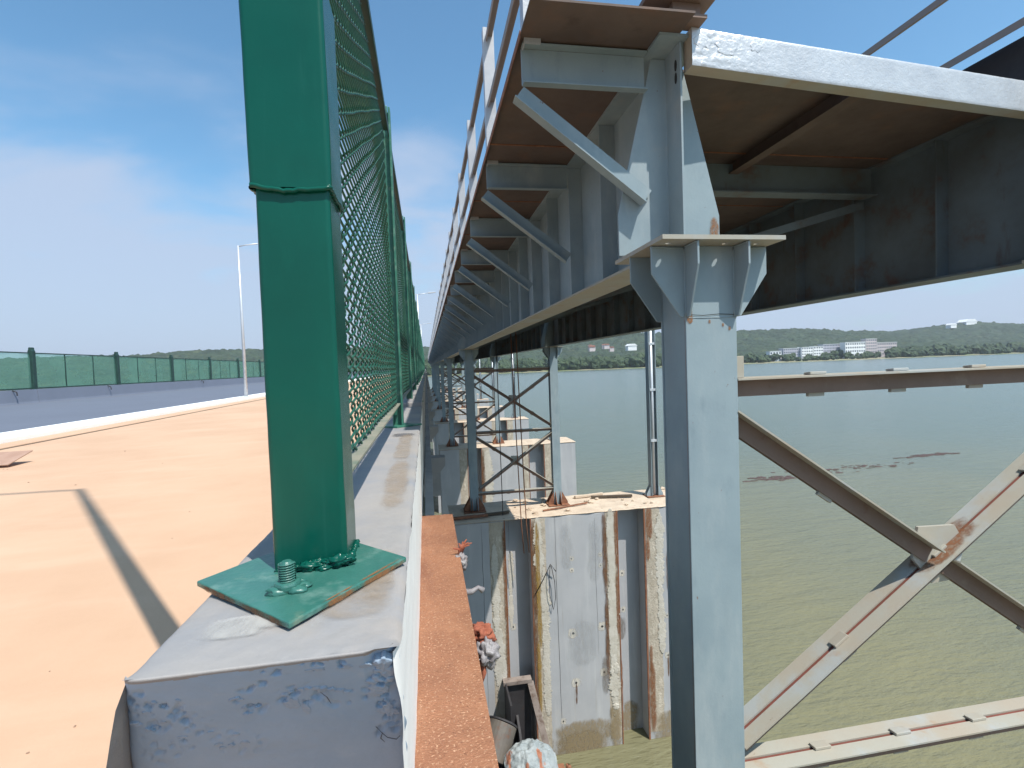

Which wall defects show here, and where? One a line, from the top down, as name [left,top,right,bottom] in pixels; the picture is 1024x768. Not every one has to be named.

corrosion [602,512,623,691]
corrosion [846,472,1024,635]
spalling [305,651,400,717]
corrosion [744,646,834,730]